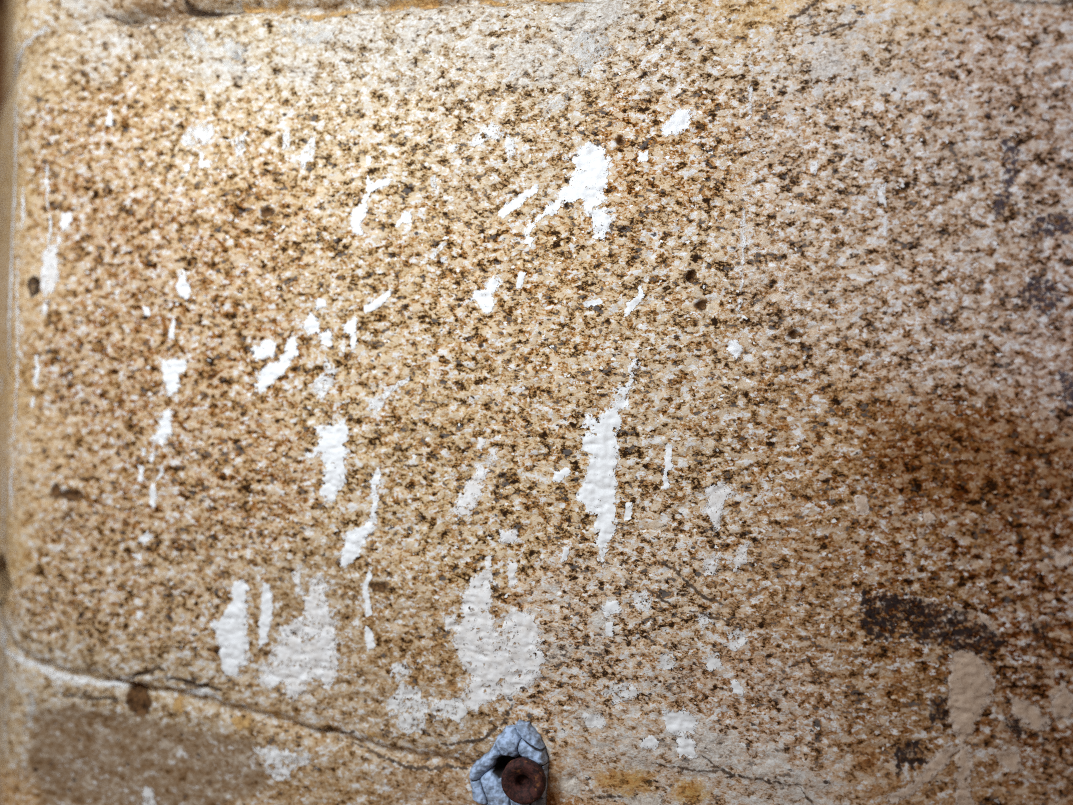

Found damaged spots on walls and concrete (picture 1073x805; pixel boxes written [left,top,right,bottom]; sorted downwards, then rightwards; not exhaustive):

spalling [0,552,14,611]
crack [299,704,513,771]
crack [651,755,814,805]